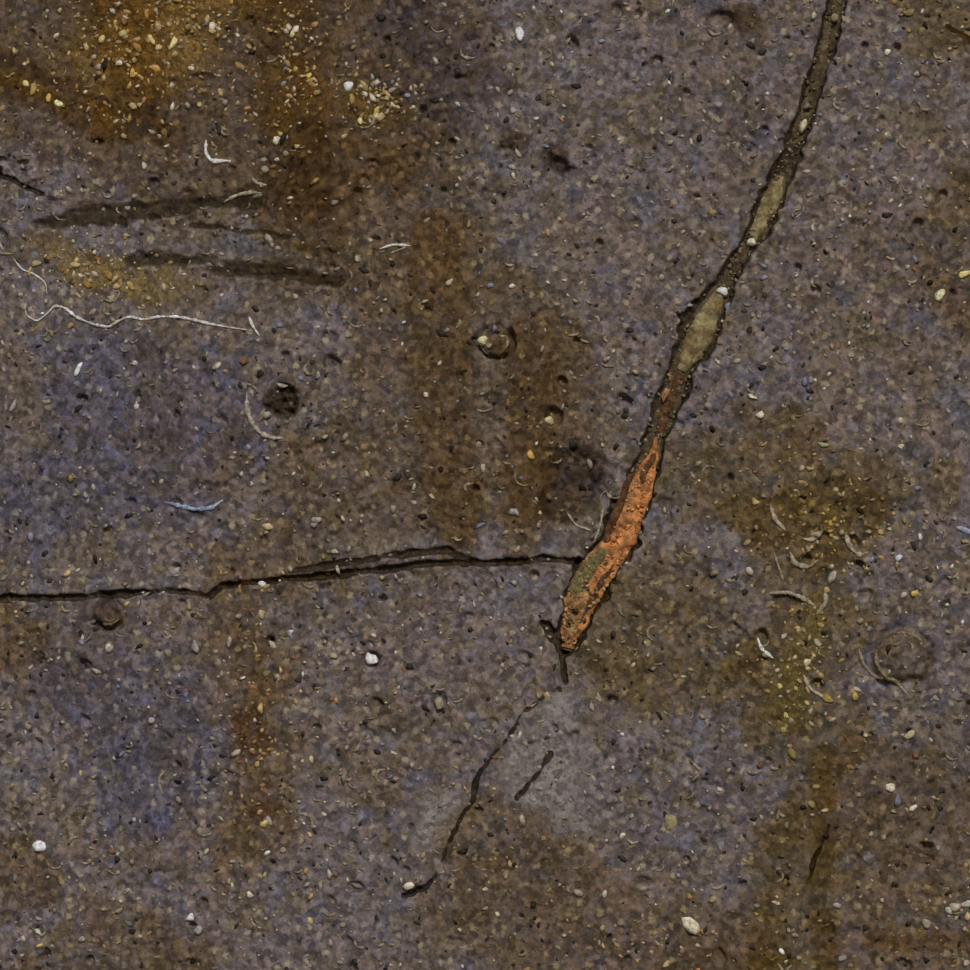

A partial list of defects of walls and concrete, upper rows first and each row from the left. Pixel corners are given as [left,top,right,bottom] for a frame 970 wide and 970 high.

damp [230,18,336,172]
crack [945,24,970,44]
damp [1,112,120,279]
crack [0,0,847,862]
rust [560,437,659,649]
crack [401,873,438,898]
crack [808,824,830,880]